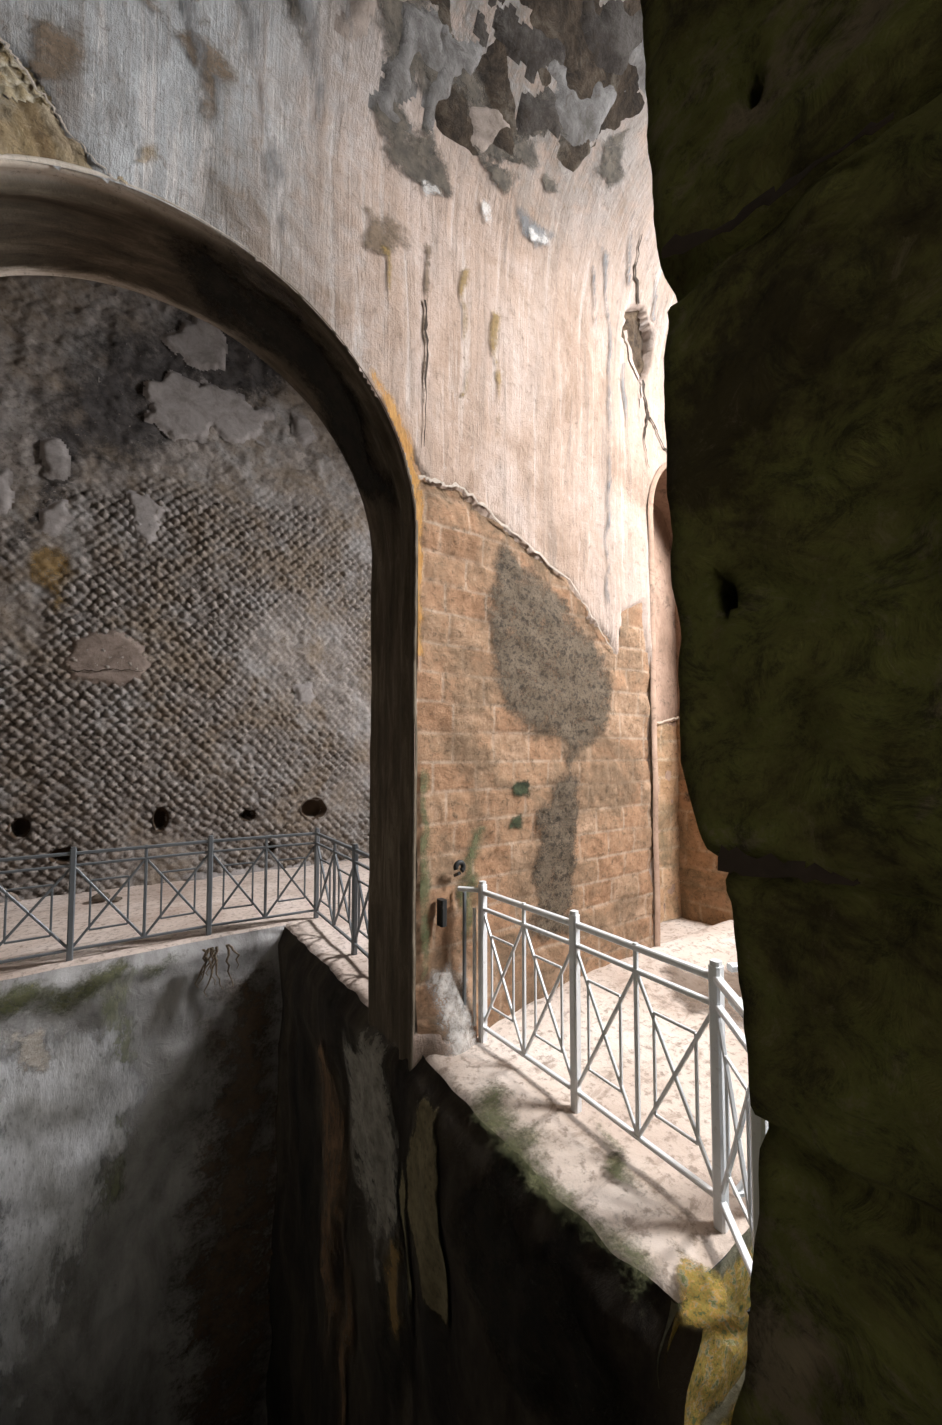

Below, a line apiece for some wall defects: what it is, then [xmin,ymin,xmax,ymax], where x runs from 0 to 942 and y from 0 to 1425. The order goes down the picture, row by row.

peeling [334,0,380,43]
spalling [0,42,93,170]
peeling [368,0,646,198]
crack [642,380,667,468]
spalling [407,451,733,1047]
spalling [8,818,30,839]
spalling [48,846,80,864]
spalling [153,807,169,832]
leakage [0,980,146,1381]
leakage [167,963,282,1425]